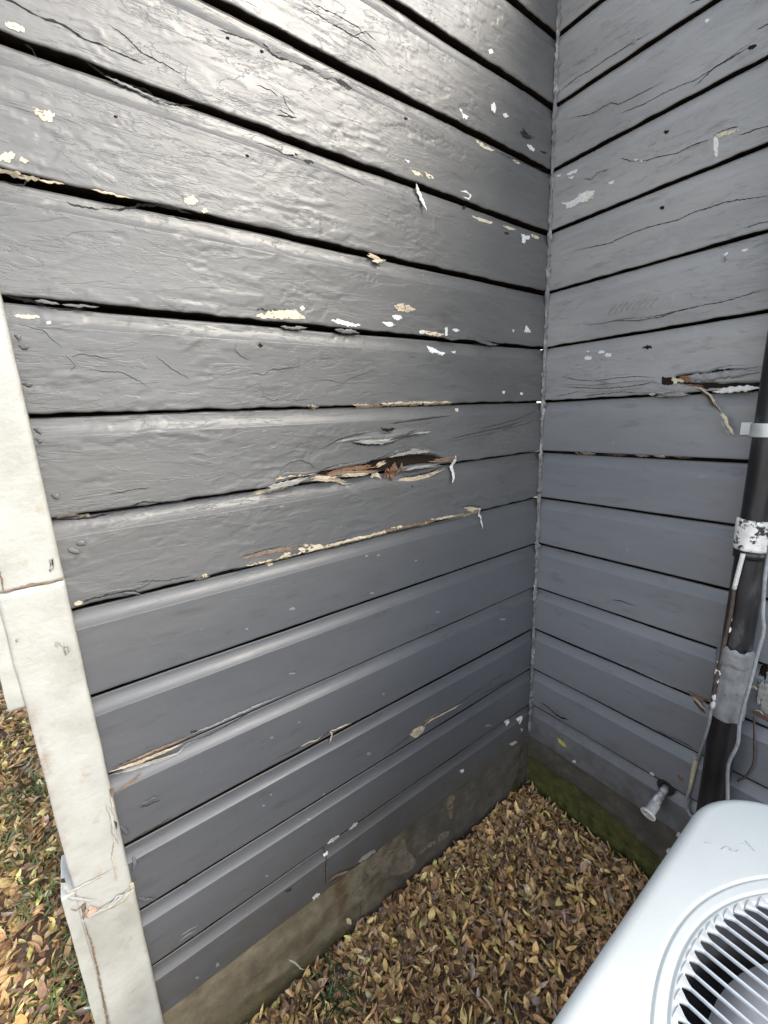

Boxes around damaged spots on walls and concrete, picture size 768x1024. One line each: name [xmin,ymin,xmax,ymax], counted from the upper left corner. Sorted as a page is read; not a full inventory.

crack [7,0,193,106]
crack [219,29,352,90]
crack [308,3,378,53]
crack [564,24,768,118]
peeling [0,151,39,182]
crack [4,179,200,221]
crack [256,142,363,185]
peeling [405,159,434,210]
peeling [257,304,307,331]
peeling [408,327,460,357]
spalling [349,454,440,471]
peeling [196,505,483,580]